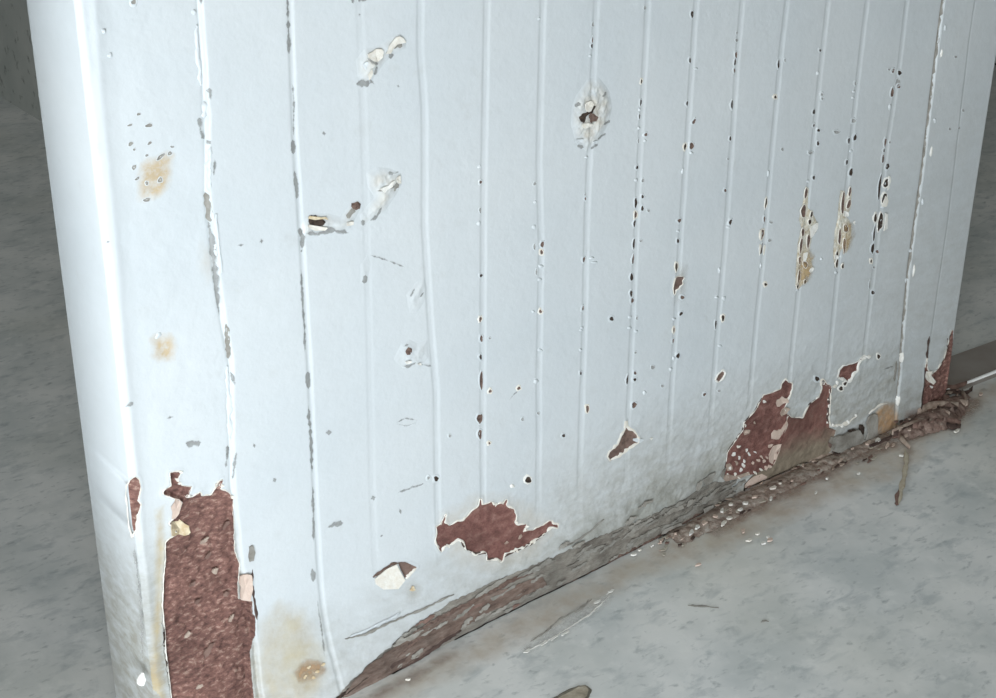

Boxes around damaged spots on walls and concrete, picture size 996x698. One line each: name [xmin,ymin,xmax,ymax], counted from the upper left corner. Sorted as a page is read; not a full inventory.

rust [122,136,187,215]
peeling [582,101,594,129]
spalling [682,140,695,154]
spalling [627,164,650,333]
spalling [669,261,685,371]
peeling [418,474,566,587]
rust [125,330,996,698]
peeling [607,370,653,461]
spalling [631,352,908,556]
leakage [894,450,909,505]
peeling [373,562,417,591]